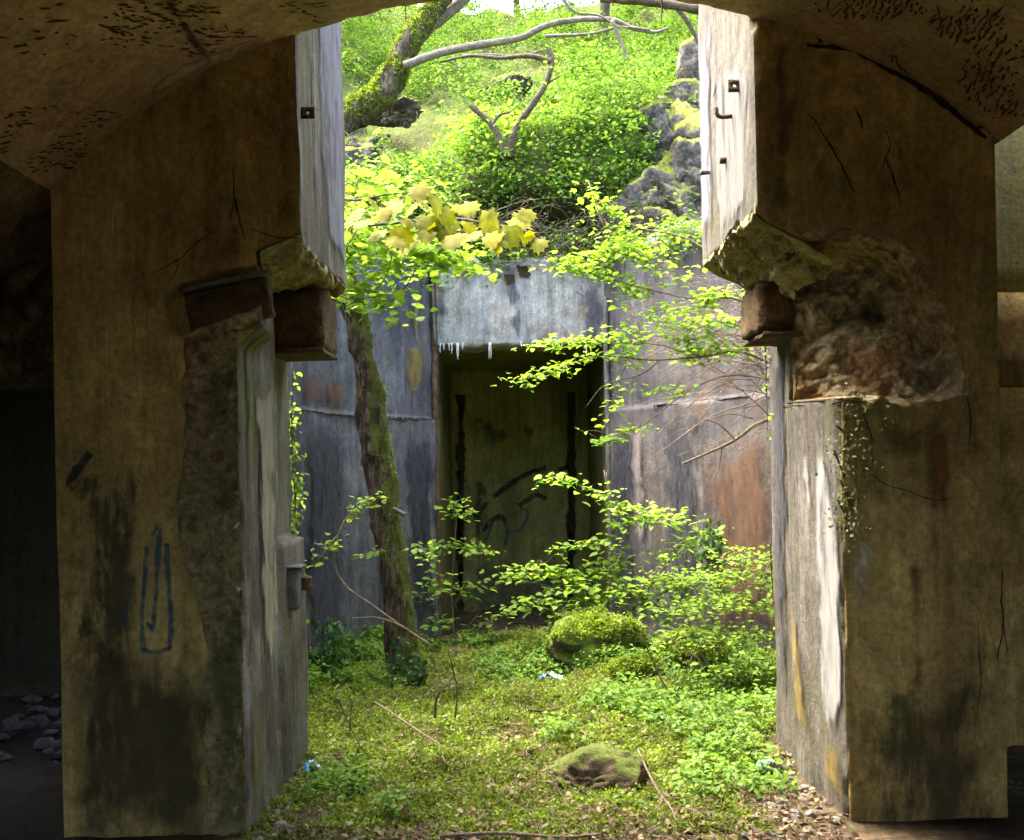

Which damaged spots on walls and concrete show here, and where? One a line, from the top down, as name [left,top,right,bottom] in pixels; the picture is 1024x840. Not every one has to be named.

crack [149,30,321,278]
crack [806,112,856,194]
crack [854,108,902,209]
crack [806,37,991,139]
spalling [703,204,968,403]
leakage [79,478,221,834]
spalling [175,309,259,836]
leakage [455,391,577,611]
rust [709,444,774,621]
leakage [804,460,840,721]
crack [977,570,1008,719]